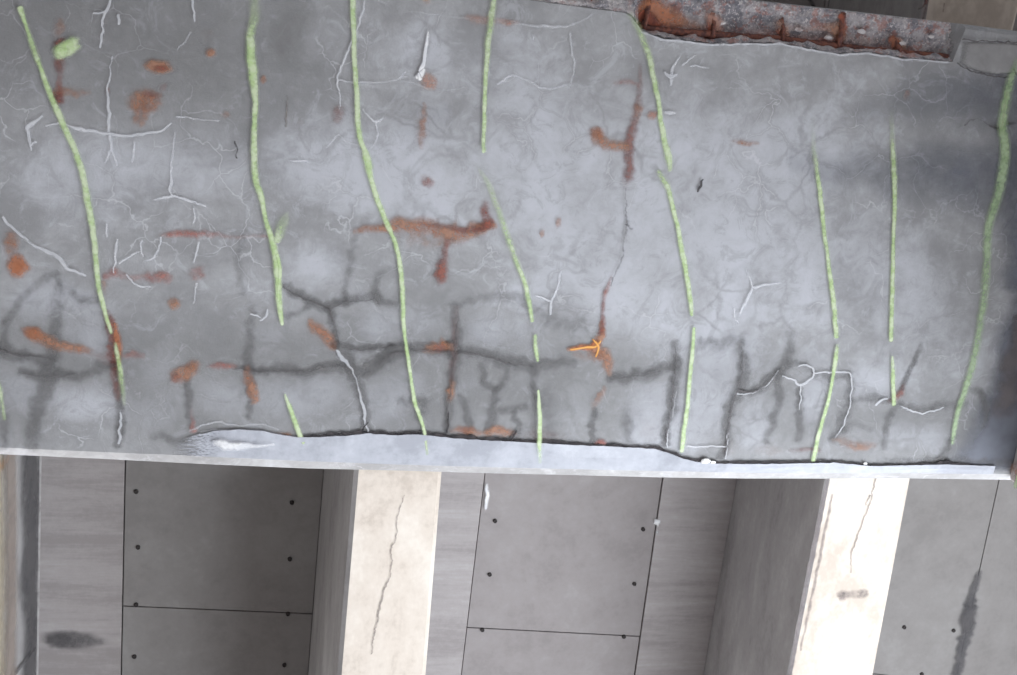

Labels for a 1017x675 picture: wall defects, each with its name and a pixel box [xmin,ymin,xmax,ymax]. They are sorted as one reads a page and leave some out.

spalling [536,0,953,63]
corrosion [593,106,657,180]
corrosion [359,208,496,282]
crack [537,283,559,315]
crack [733,275,774,321]
crack [116,412,124,444]
crack [232,332,972,559]
leakage [0,455,39,675]
crack [371,508,400,654]
leakage [49,633,97,648]
leakage [953,573,981,675]